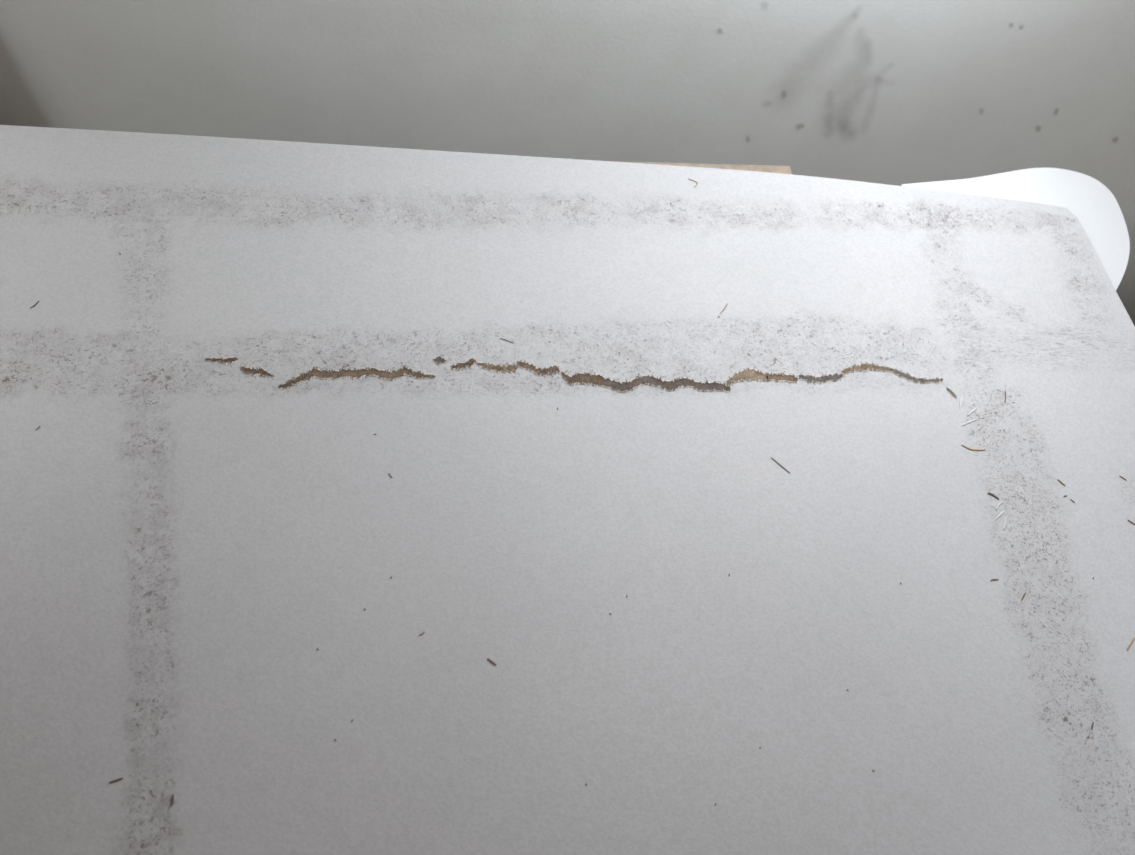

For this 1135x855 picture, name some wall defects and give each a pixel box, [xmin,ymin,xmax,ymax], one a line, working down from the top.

crack [205,356,957,399]